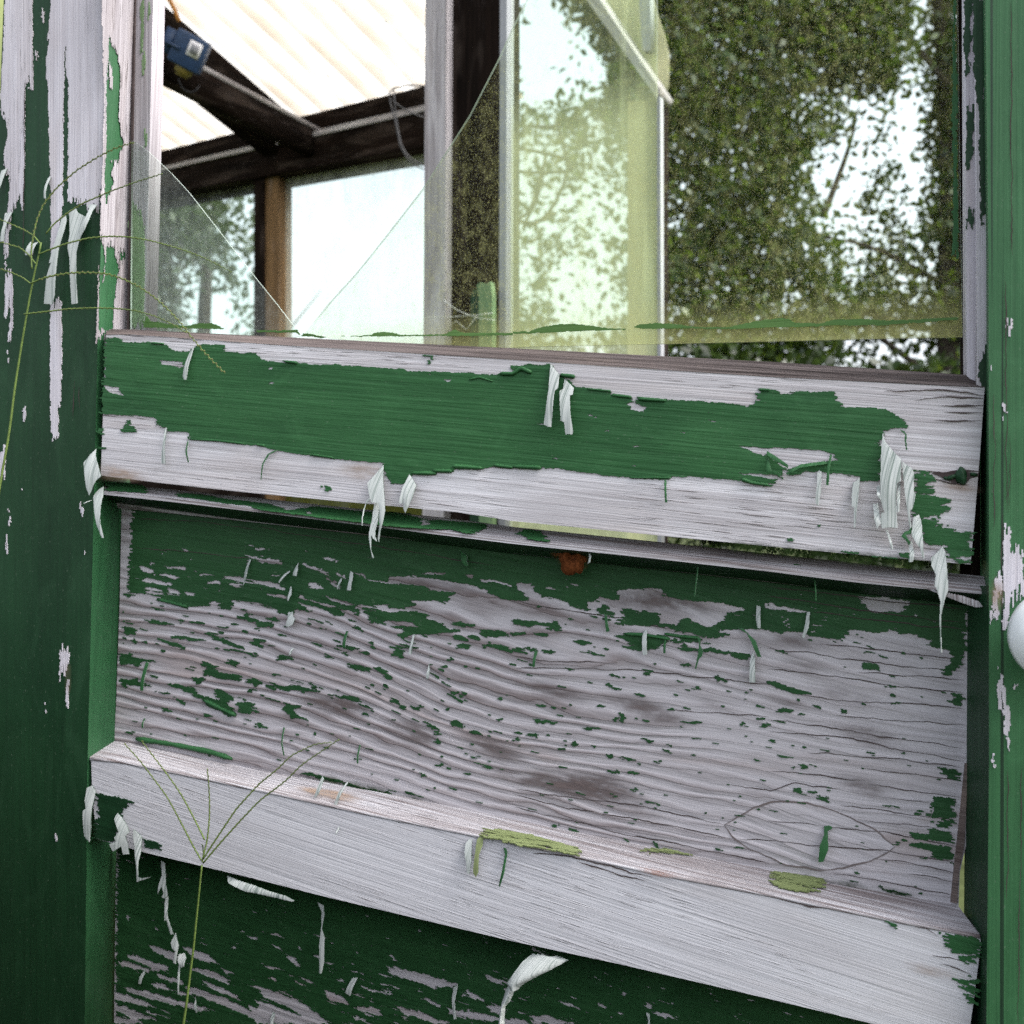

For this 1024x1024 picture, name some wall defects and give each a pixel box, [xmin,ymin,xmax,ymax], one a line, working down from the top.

peeling [0,0,1024,798]
peeling [606,754,668,809]
peeling [893,796,957,865]
peeling [82,785,871,1024]
peeling [939,932,982,1006]